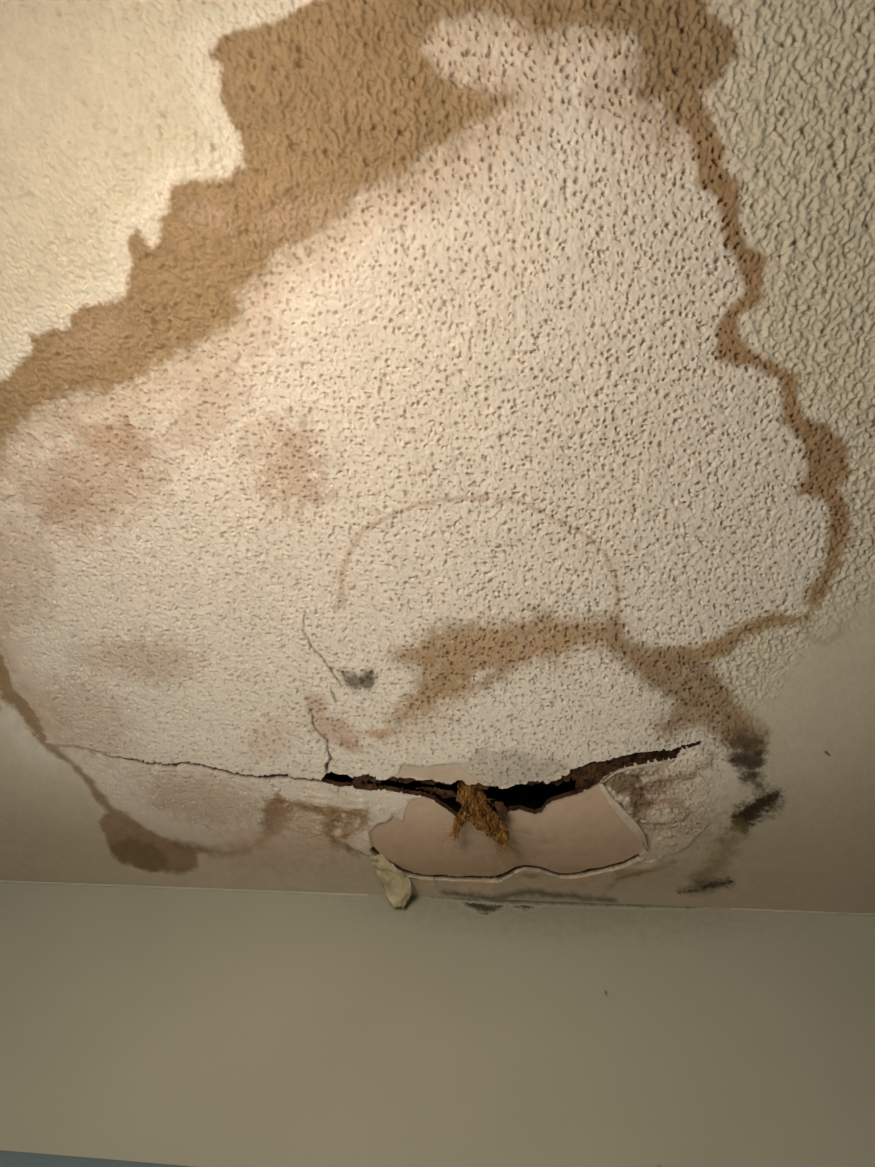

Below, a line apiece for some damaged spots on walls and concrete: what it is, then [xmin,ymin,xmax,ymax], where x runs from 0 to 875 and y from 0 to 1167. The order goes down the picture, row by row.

water stain [0,0,858,898]
crack [46,610,342,784]
water stain [302,894,856,954]